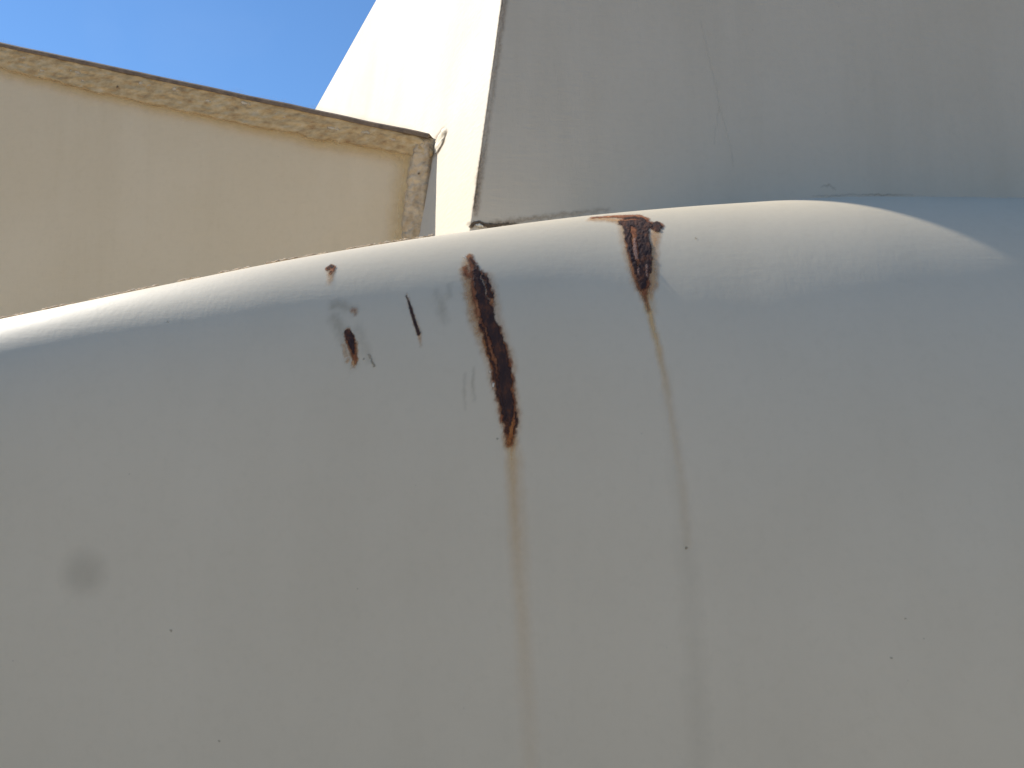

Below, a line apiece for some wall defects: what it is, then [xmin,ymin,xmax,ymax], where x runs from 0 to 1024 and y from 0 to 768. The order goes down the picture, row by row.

rust [591,215,664,337]
rust [344,329,358,366]
rust [462,254,518,447]